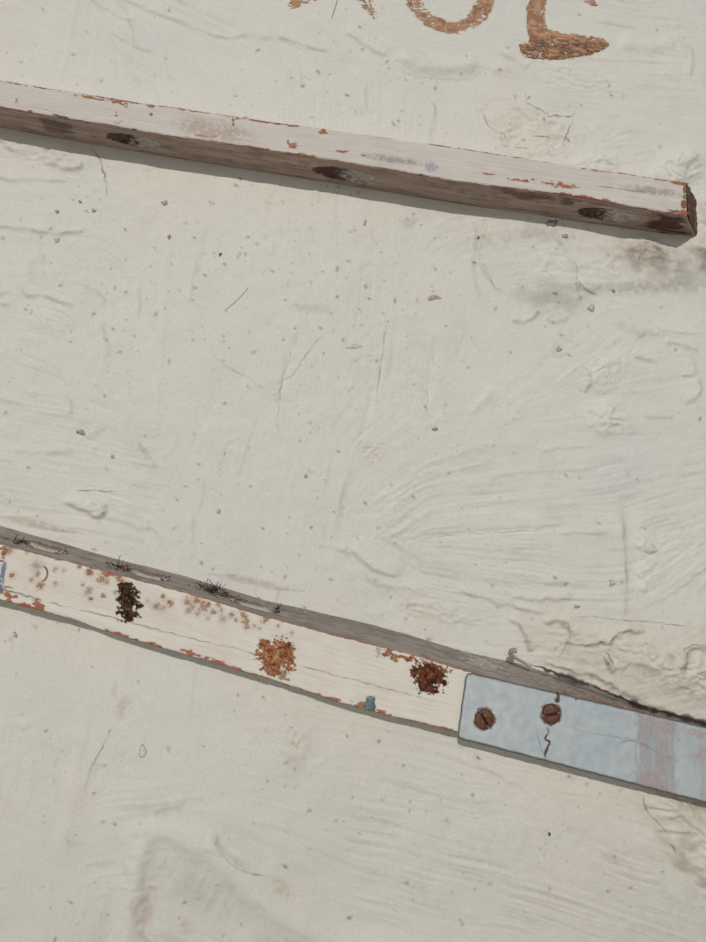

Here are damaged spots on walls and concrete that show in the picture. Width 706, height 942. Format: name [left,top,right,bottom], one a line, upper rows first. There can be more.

rust [78,565,249,628]
rust [255,617,296,677]
rust [382,649,452,695]